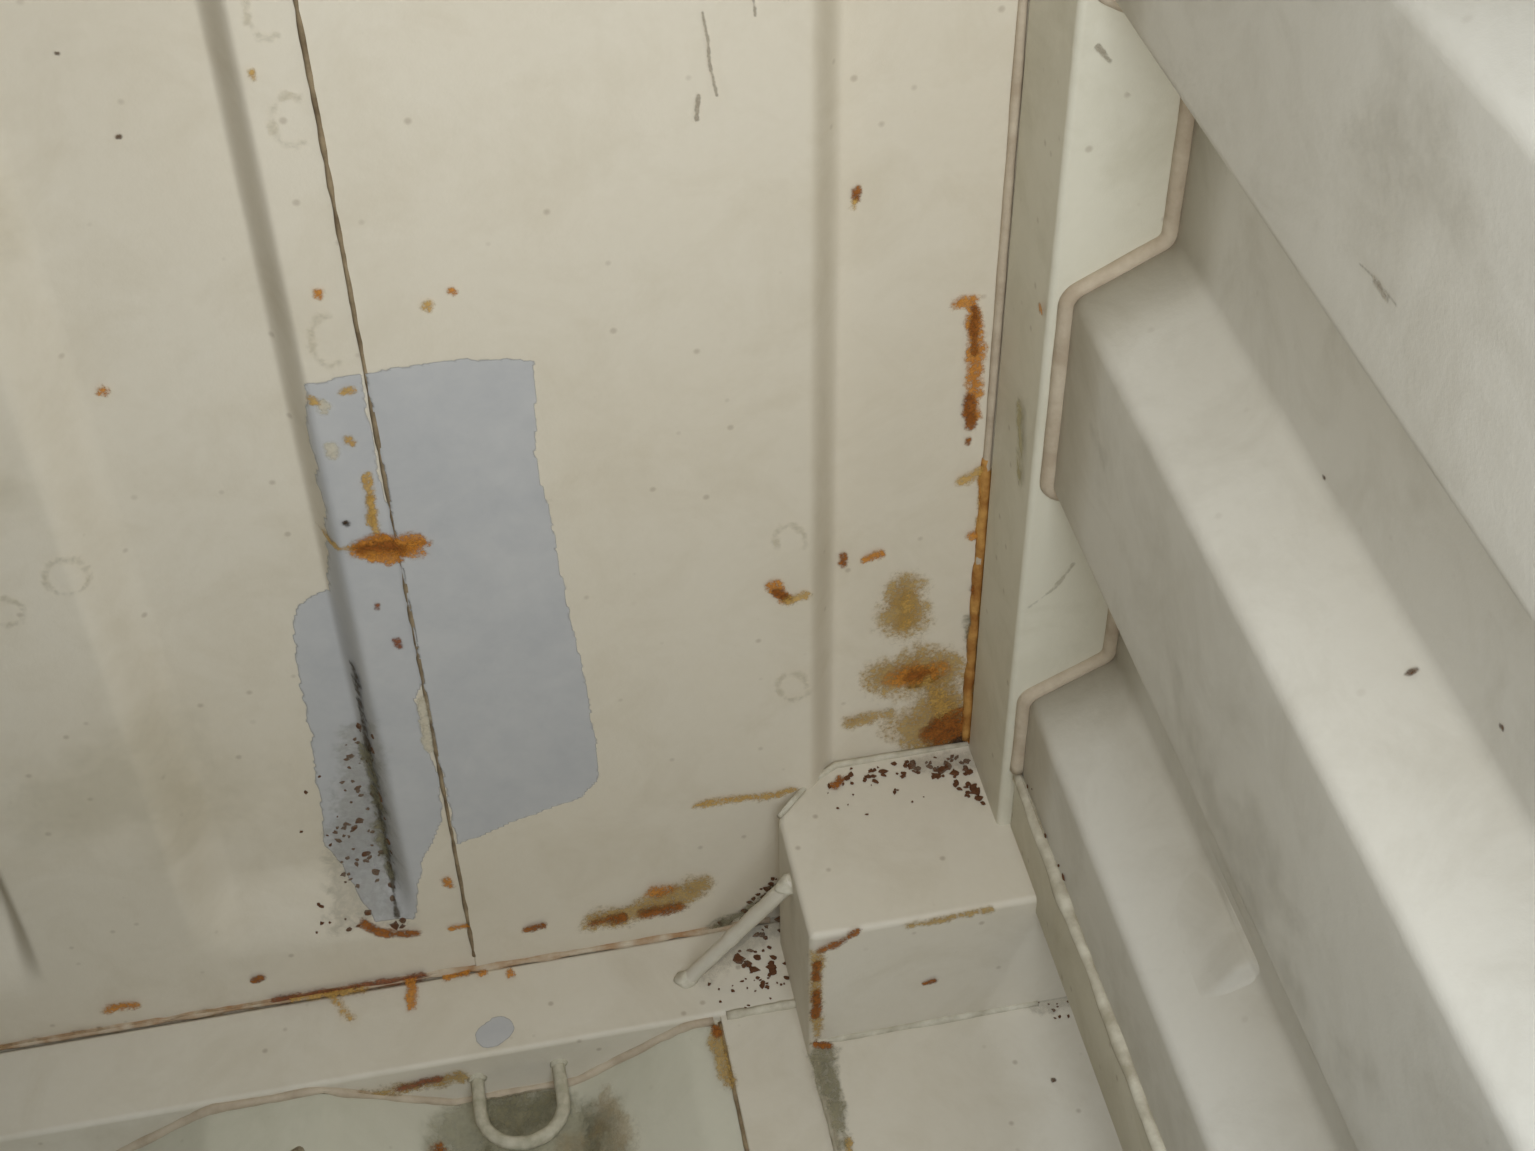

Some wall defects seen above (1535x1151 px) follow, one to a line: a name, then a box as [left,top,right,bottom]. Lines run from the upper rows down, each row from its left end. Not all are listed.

rust [952,295,988,446]
rust [322,472,431,566]
rust [838,458,992,749]
peeling [326,723,396,902]
crack [350,662,420,938]
rust [693,788,796,808]
peeling [316,903,372,934]
rust [582,876,713,930]
rust [248,970,488,1021]
rust [810,928,861,1037]
rust [359,1071,469,1096]
rust [428,1090,624,1151]